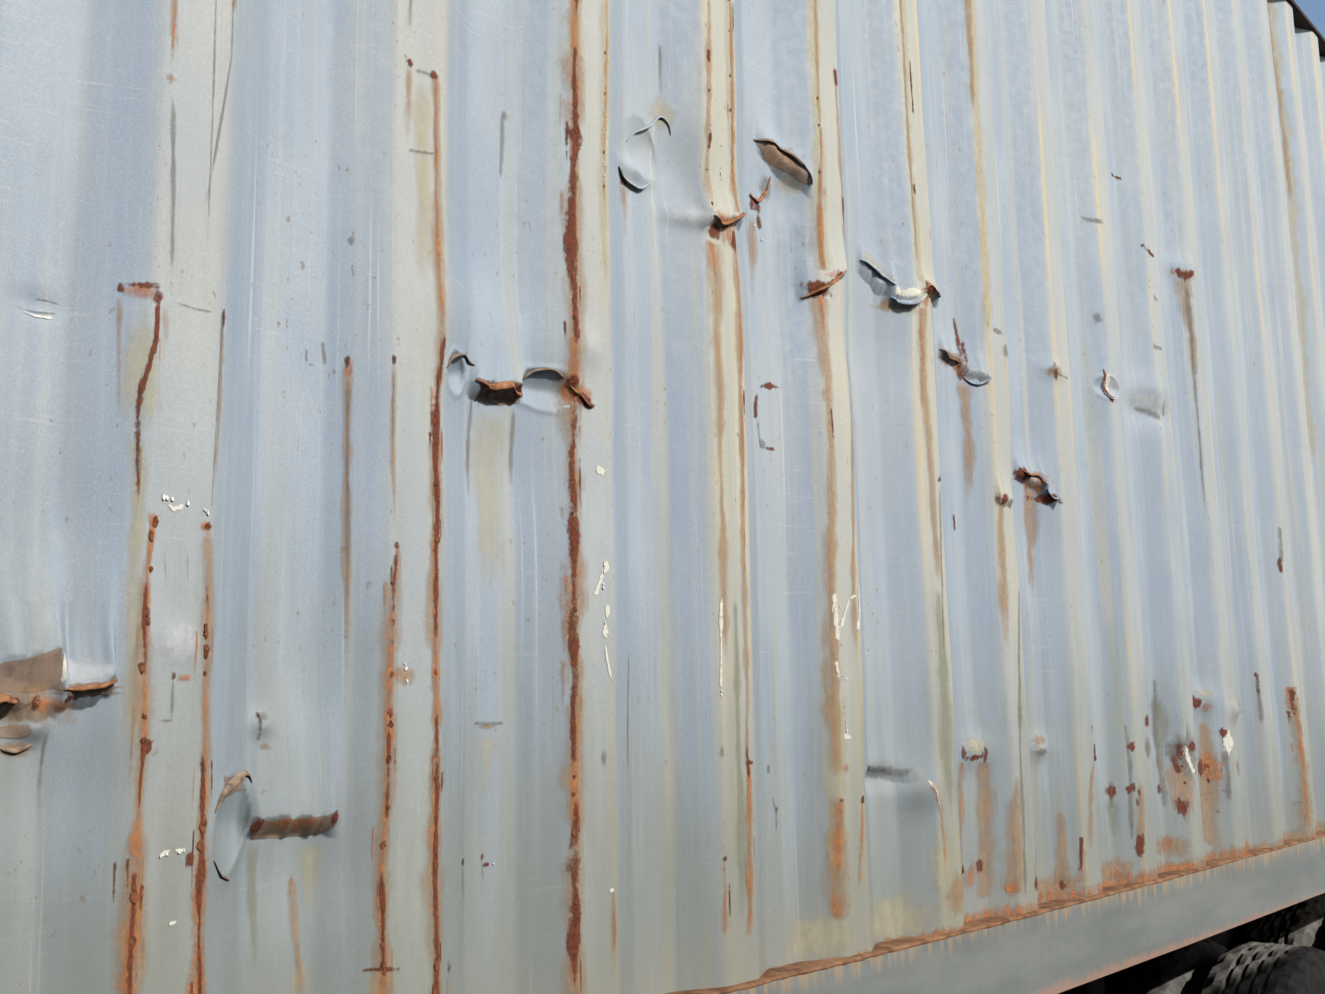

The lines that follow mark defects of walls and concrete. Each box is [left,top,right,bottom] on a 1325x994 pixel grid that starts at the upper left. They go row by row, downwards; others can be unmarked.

rust [113,515,159,994]
rust [118,282,163,488]
rust [173,585,213,994]
rust [364,707,400,994]
rust [385,542,412,687]
rust [406,59,439,170]
rust [429,337,450,994]
rust [436,197,444,315]
rust [561,0,590,993]
rust [816,95,840,274]
rust [815,297,848,769]
rust [962,682,1322,922]